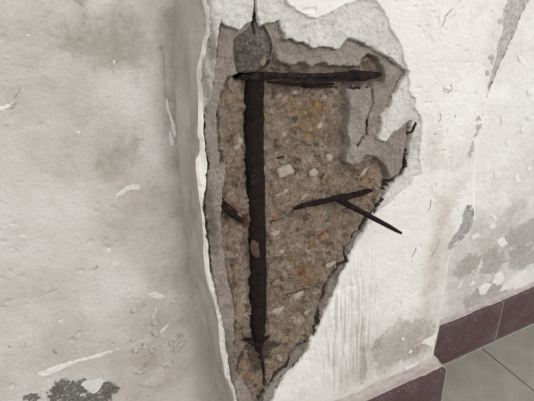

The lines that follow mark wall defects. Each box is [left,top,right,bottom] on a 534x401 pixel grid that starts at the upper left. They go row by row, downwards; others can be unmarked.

spalling [201,0,421,401]
rust [235,335,281,376]
leakage [23,377,120,401]